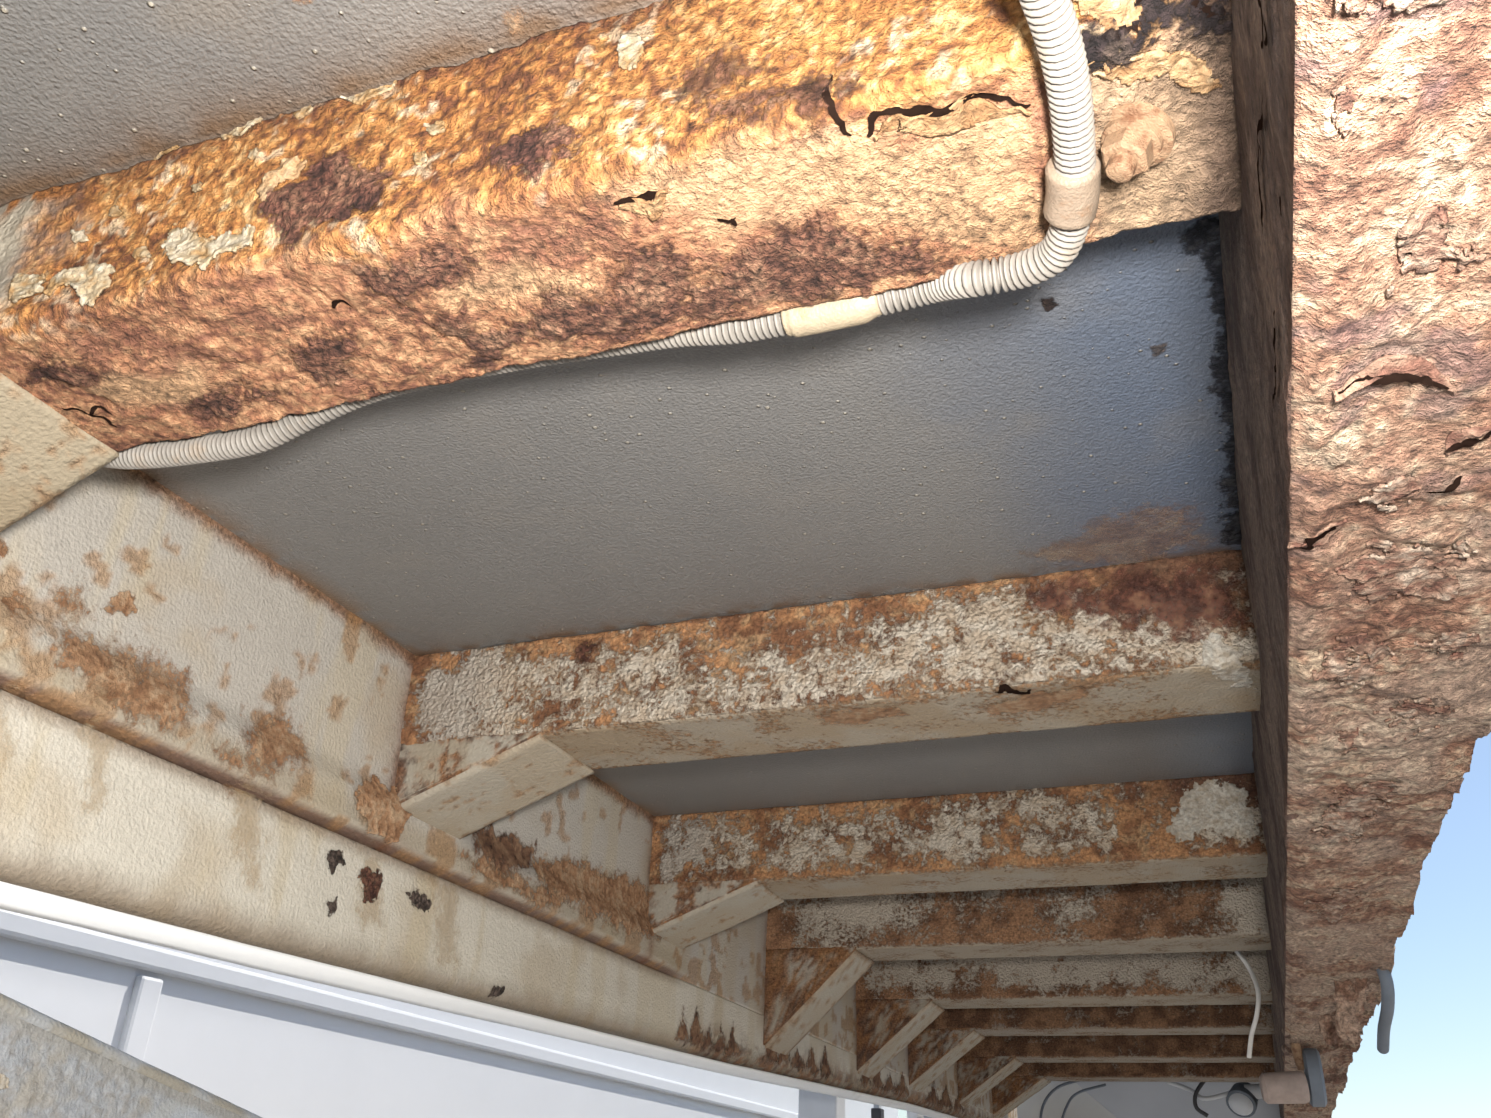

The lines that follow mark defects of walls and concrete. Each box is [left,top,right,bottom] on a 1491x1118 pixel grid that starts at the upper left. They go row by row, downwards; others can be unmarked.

peeling [1073,0,1143,30]
corrosion [1081,0,1233,74]
peeling [1093,48,1222,95]
crack [822,74,1032,142]
corrosion [250,150,394,251]
crack [614,188,669,222]
peeling [8,263,116,307]
corrosion [348,210,956,372]
crack [1333,355,1457,403]
crack [1427,425,1491,493]
corrosion [50,587,193,734]
peeling [327,850,383,903]